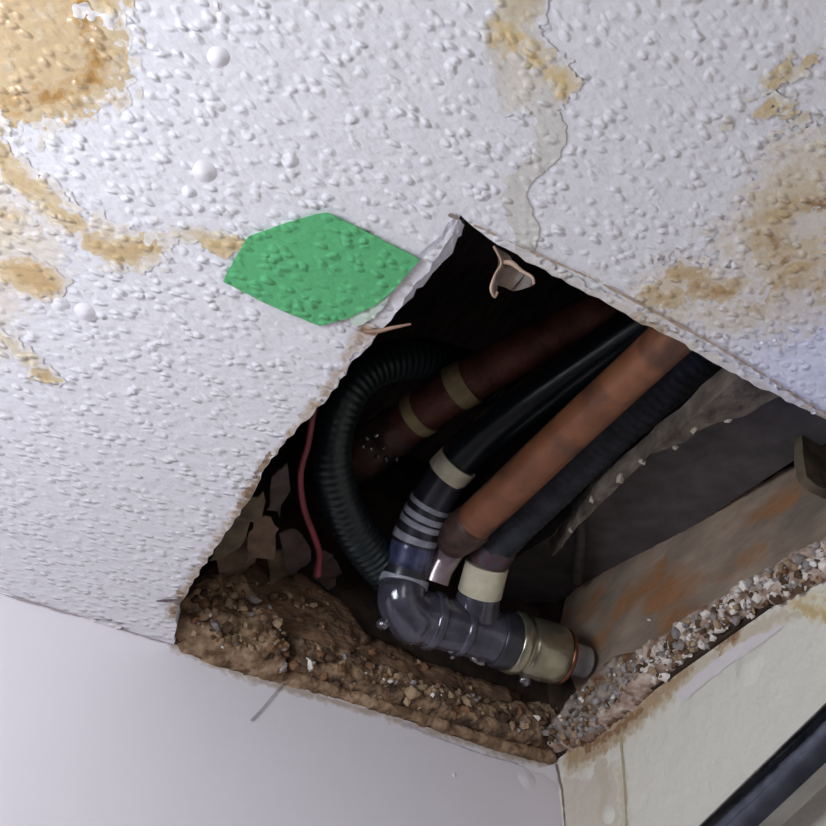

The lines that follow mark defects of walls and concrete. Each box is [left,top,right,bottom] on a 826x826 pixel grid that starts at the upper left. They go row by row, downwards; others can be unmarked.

leakage [0,0,245,388]
peeling [349,290,394,327]
flaking render [402,214,464,306]
leakage [479,0,583,253]
leakage [606,46,826,358]
spalling [174,536,826,791]